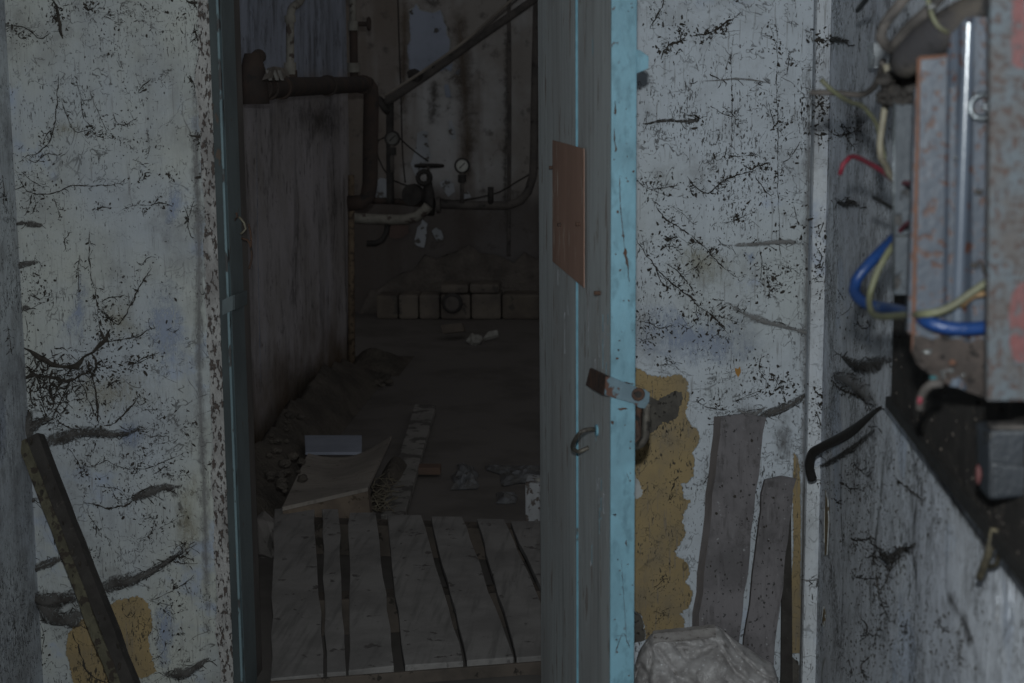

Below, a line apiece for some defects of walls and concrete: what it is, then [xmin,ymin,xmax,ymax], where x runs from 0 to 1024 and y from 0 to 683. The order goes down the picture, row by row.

peeling [615,170,635,282]
peeling [611,367,700,653]
peeling [65,618,109,683]
peeling [110,595,157,680]